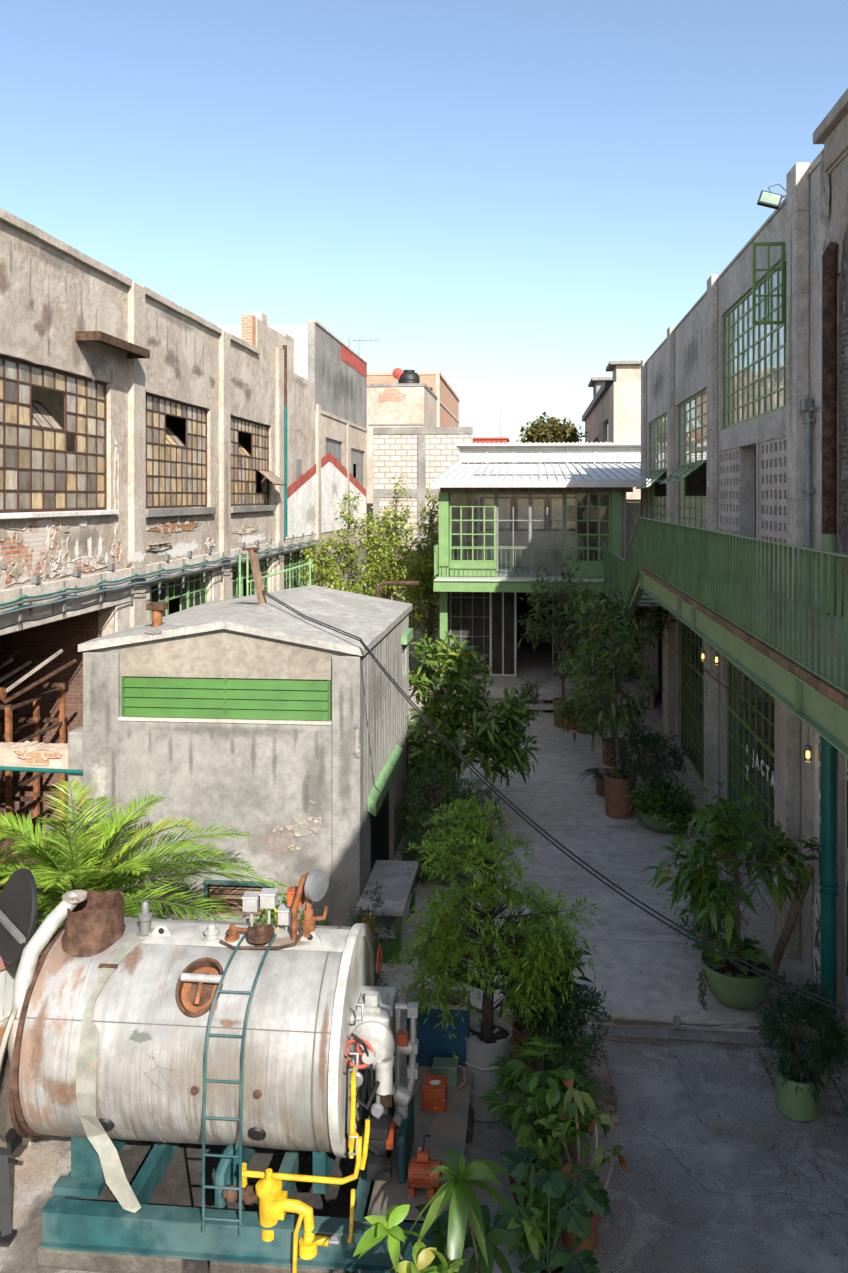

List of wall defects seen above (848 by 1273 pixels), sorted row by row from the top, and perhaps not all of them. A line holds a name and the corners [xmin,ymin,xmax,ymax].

water stain [8,299,68,362]
water stain [149,339,180,377]
flaking render [0,440,215,590]
flaking render [14,746,63,765]
peeling [272,800,323,851]
crack [586,1035,848,1209]